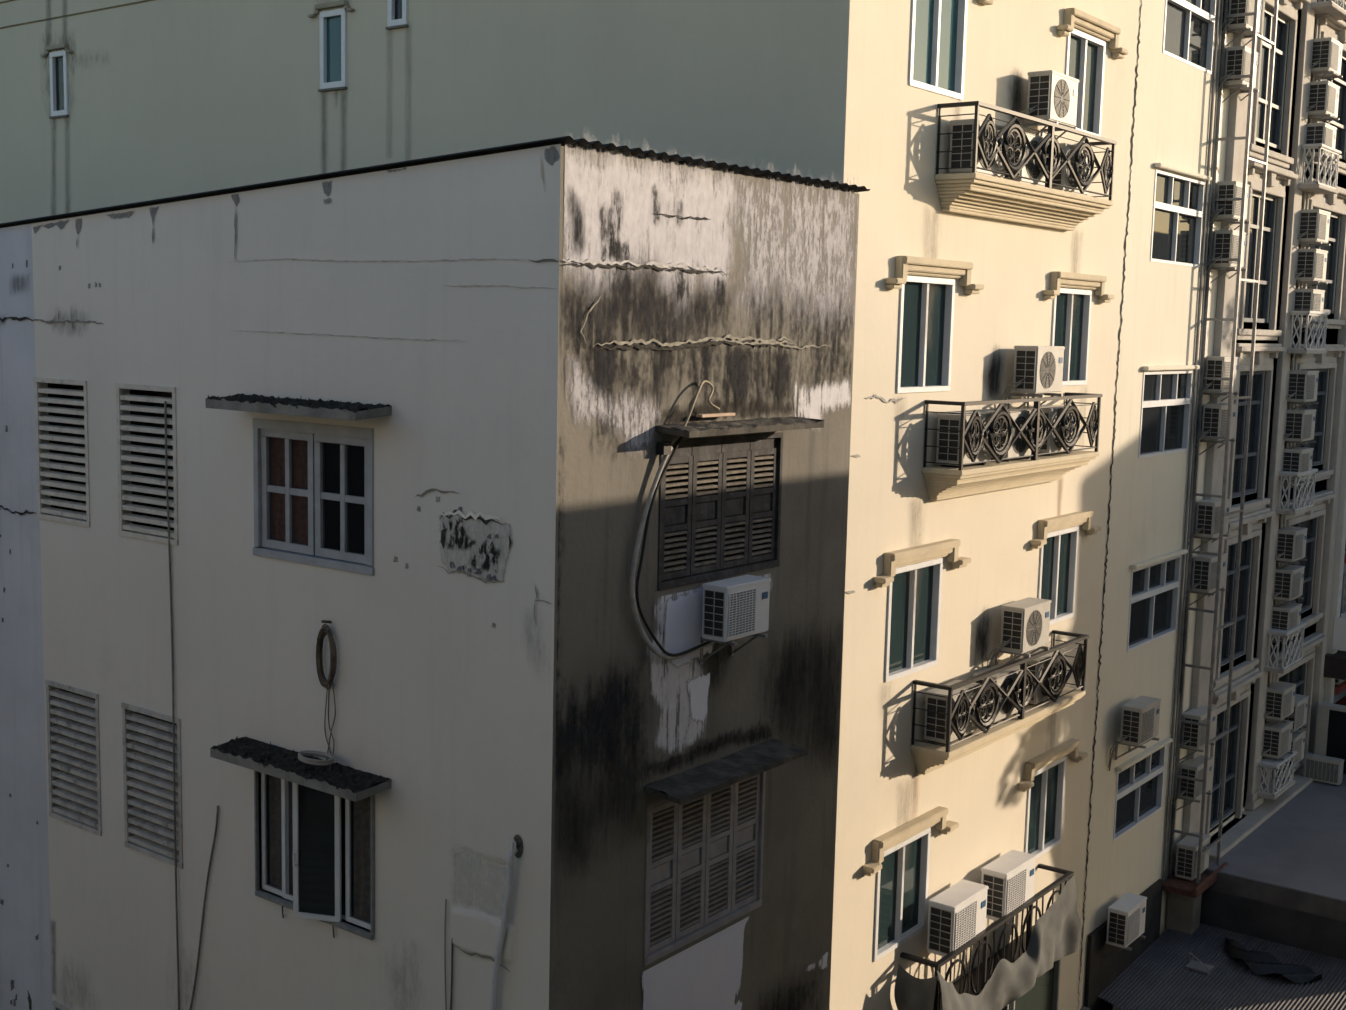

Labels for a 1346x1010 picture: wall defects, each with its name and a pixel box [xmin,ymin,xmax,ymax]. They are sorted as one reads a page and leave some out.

crack [233,258,830,349]
mould [560,193,852,436]
flaking render [436,496,512,583]
damp [555,640,648,858]
peeling [664,587,713,723]
damp [772,638,842,758]
peeling [641,917,749,1010]